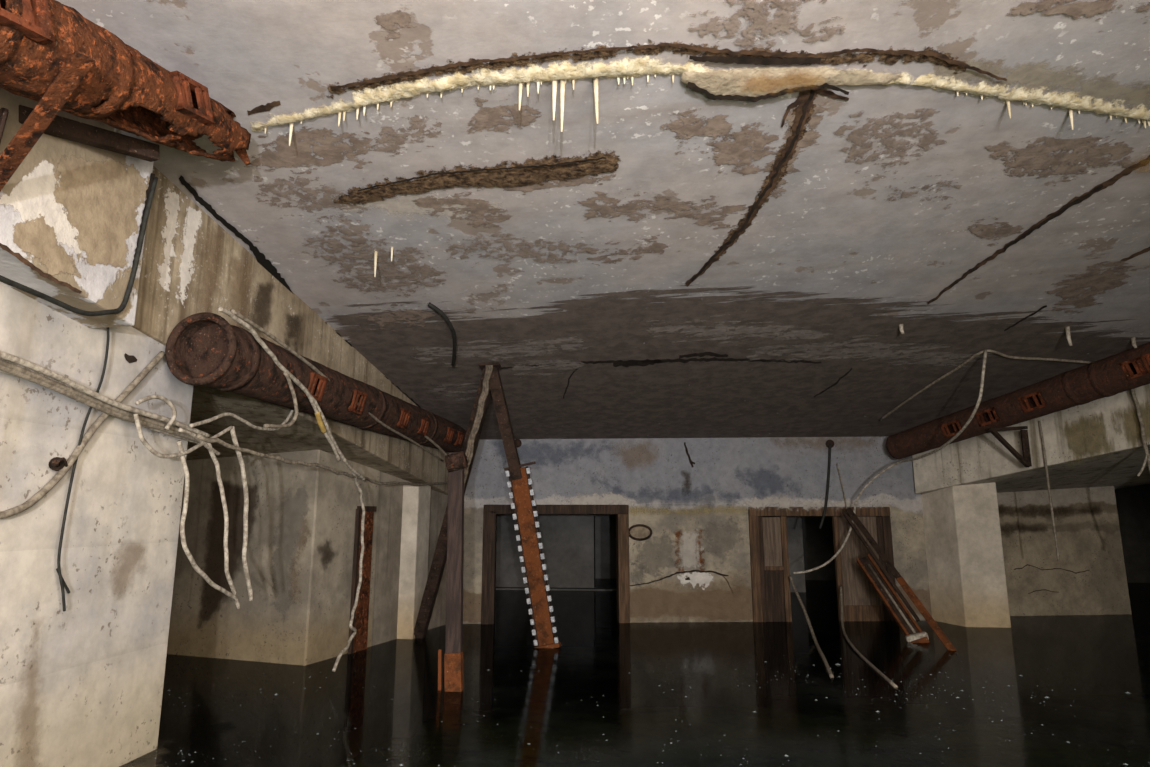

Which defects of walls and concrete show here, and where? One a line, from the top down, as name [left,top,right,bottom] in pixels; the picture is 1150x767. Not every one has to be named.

efflorescence [936,60,1150,111]
peeling [0,155,150,279]
crack [247,39,1150,304]
water stain [325,285,1150,440]
crack [1004,305,1047,331]